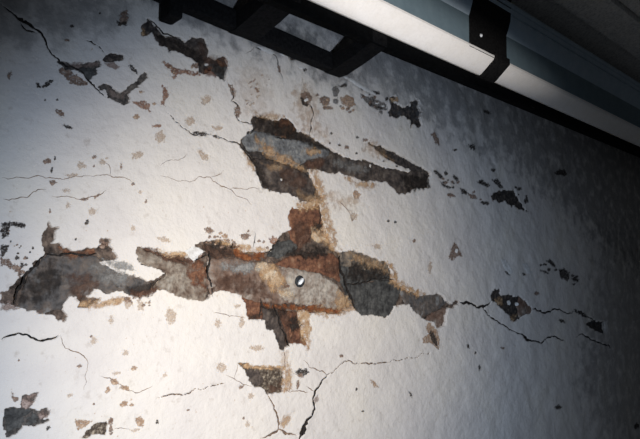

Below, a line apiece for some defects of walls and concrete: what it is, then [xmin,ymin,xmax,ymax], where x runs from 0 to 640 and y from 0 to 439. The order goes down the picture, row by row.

crack [1,4,104,96]
spalling [57,53,123,86]
spalling [141,19,235,96]
spalling [300,76,421,128]
spalling [0,116,532,350]
rust [296,170,338,251]
crack [460,301,610,347]
spalling [3,392,51,437]
crack [2,333,88,385]
crack [104,366,249,398]
spalling [238,363,284,398]
crack [260,353,429,439]